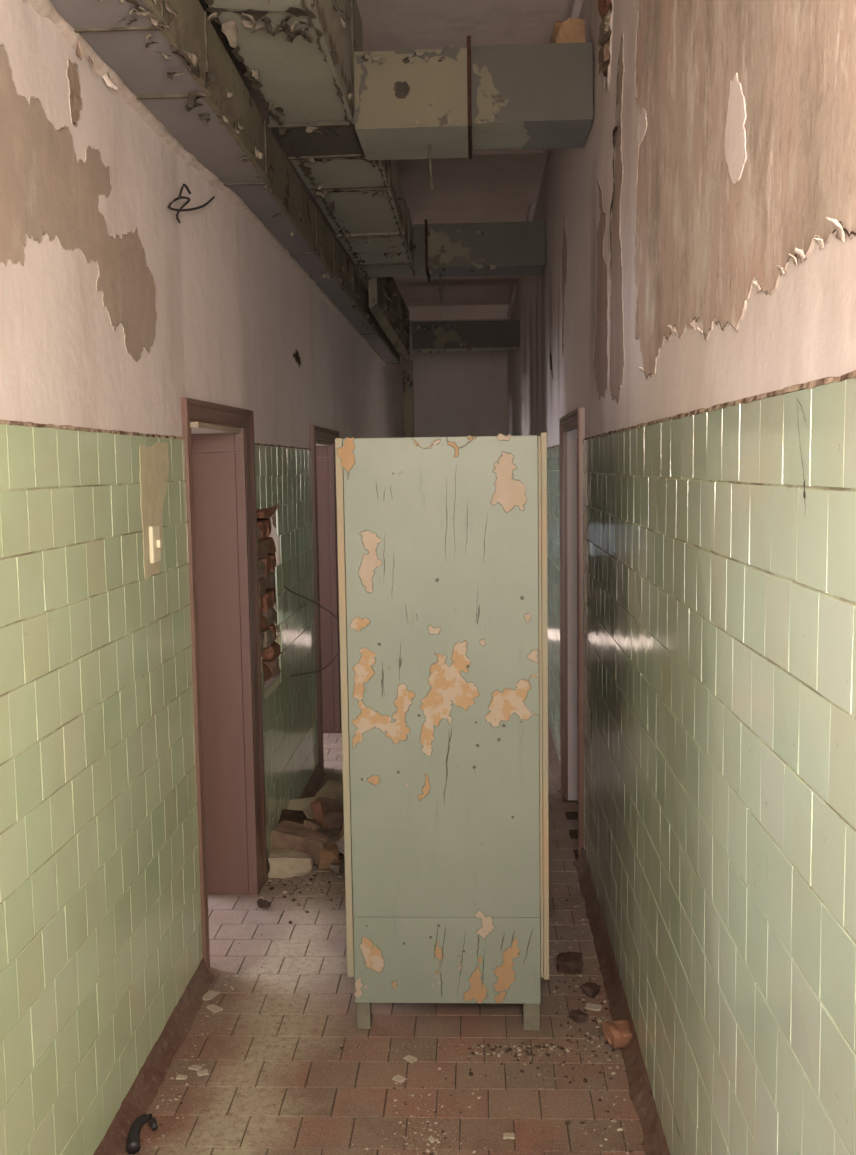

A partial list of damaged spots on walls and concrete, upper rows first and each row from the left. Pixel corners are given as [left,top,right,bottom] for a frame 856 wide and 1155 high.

peeling [118,0,244,134]
peeling [208,0,314,48]
peeling [348,46,460,125]
flaking render [0,43,158,363]
flaking render [593,0,856,405]
crack [797,399,807,510]
spalling [257,493,285,685]